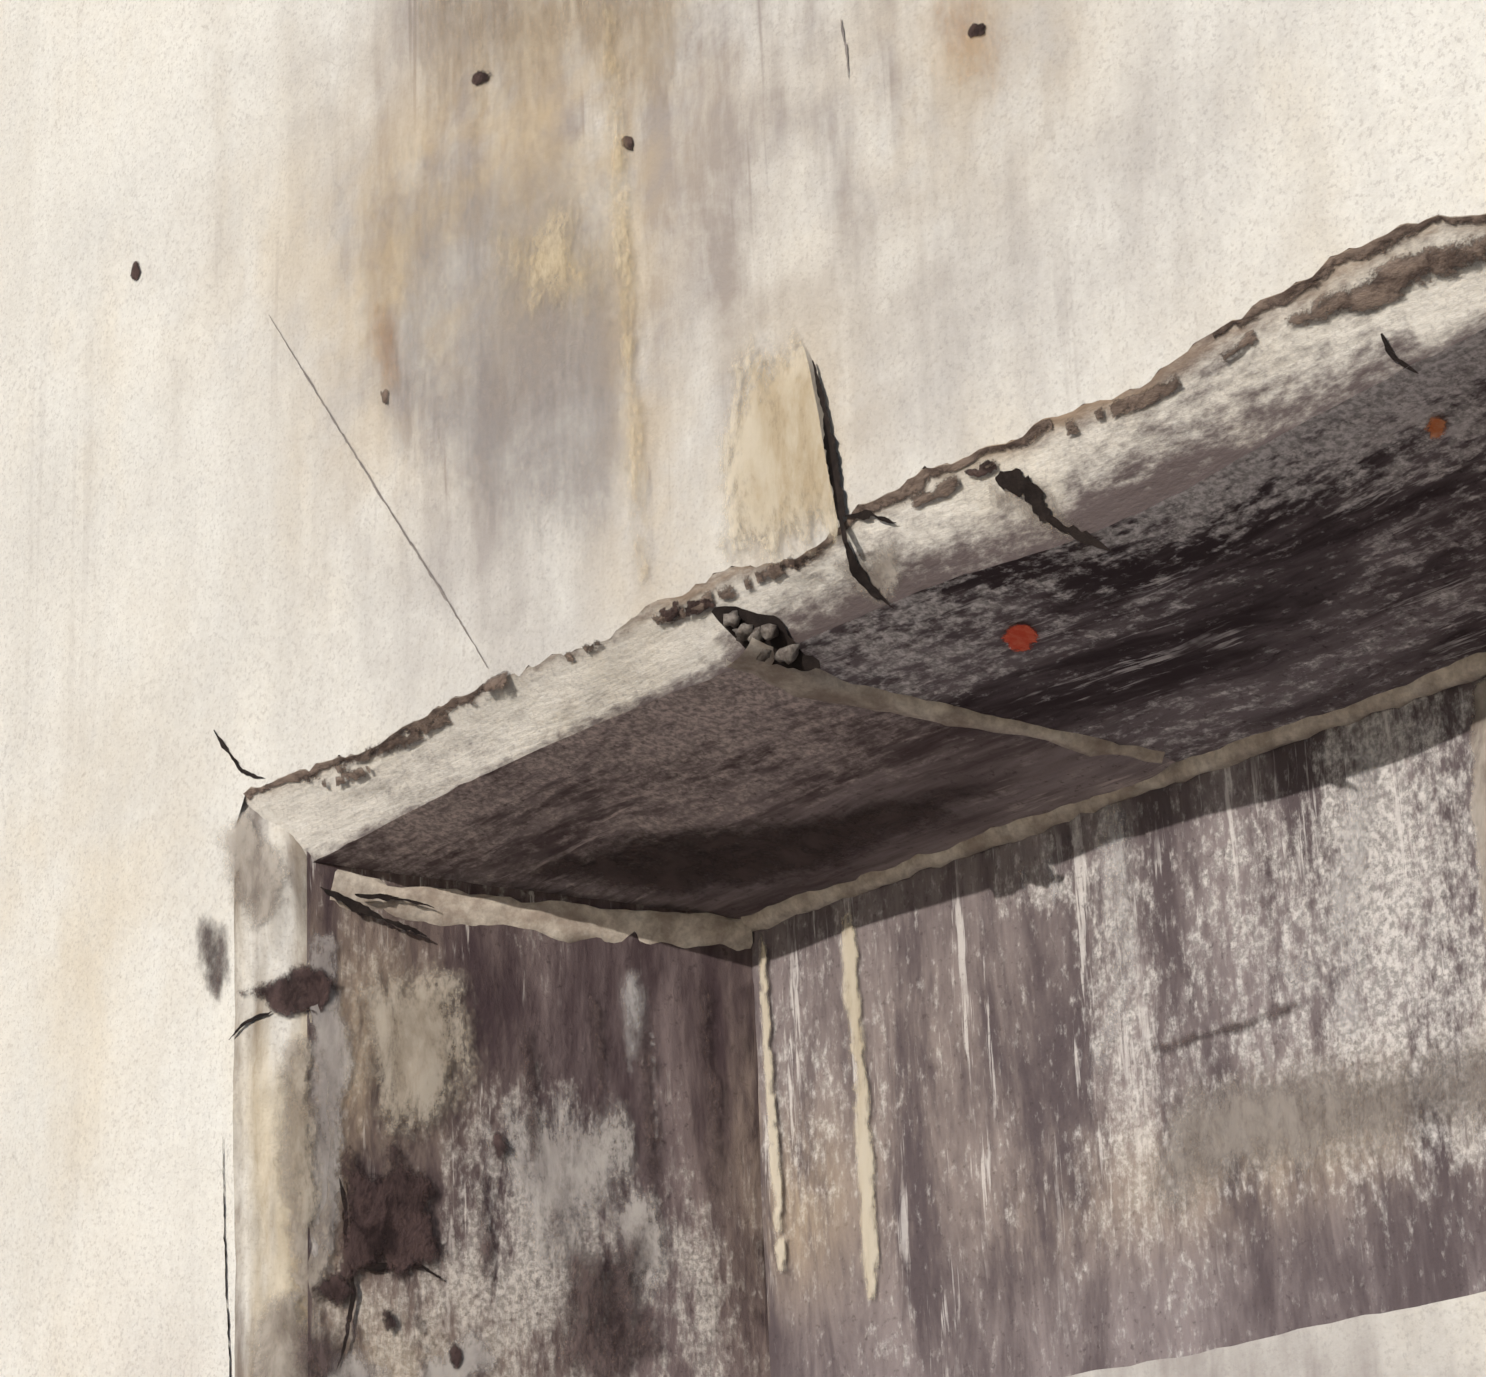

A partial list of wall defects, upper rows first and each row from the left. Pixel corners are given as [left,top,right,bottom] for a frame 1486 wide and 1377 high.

crack [270,317,488,668]
water stain [515,214,582,295]
crack [812,360,896,609]
spalling [651,418,1079,671]
flaking render [1094,374,1181,421]
flaking render [1212,214,1486,362]
peeling [218,671,508,924]
peeling [229,935,470,1377]
peeling [420,1331,495,1377]
peeling [491,1102,662,1376]
water stain [759,942,786,1270]
water stain [842,916,879,1299]